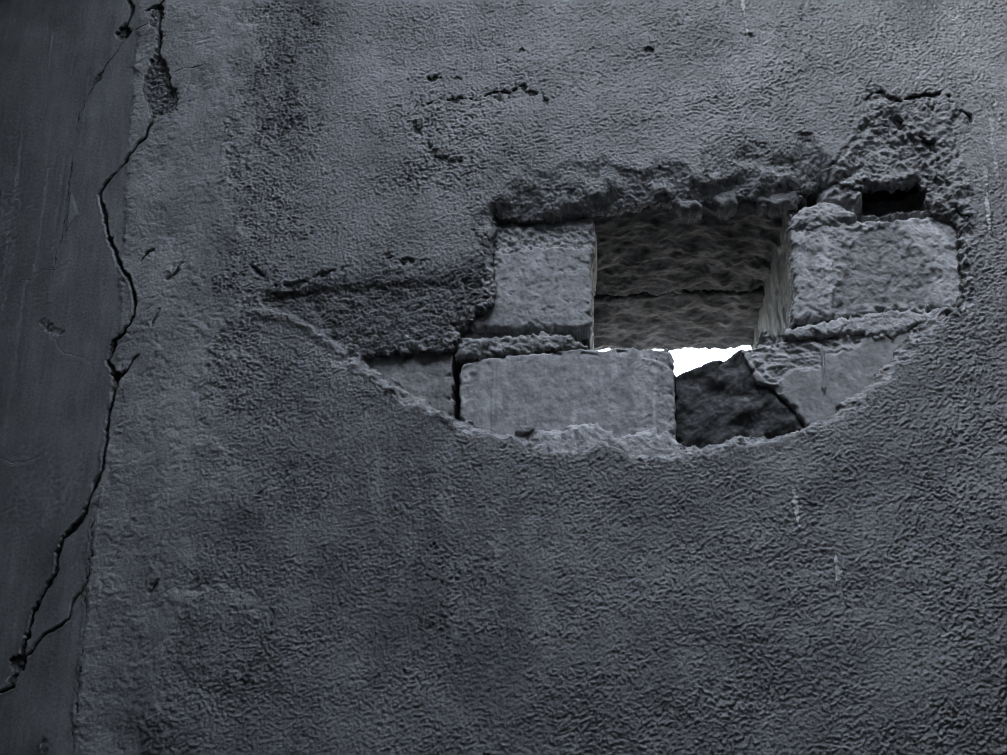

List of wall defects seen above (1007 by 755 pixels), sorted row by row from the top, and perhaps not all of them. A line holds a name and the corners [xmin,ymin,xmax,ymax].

crack [0,122,153,753]
crack [52,0,202,276]
flaking render [263,133,979,463]